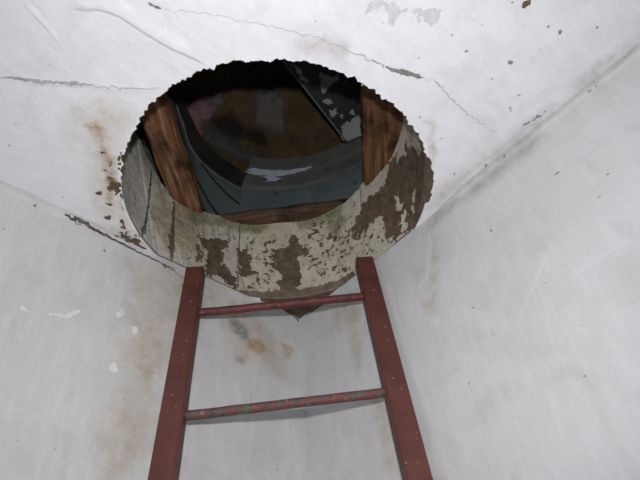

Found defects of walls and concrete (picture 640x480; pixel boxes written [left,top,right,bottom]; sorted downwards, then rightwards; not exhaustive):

peeling [365,0,442,26]
crack [166,9,384,68]
crack [1,76,159,90]
crack [425,79,498,133]
peeling [95,152,123,199]
peeling [114,219,146,250]